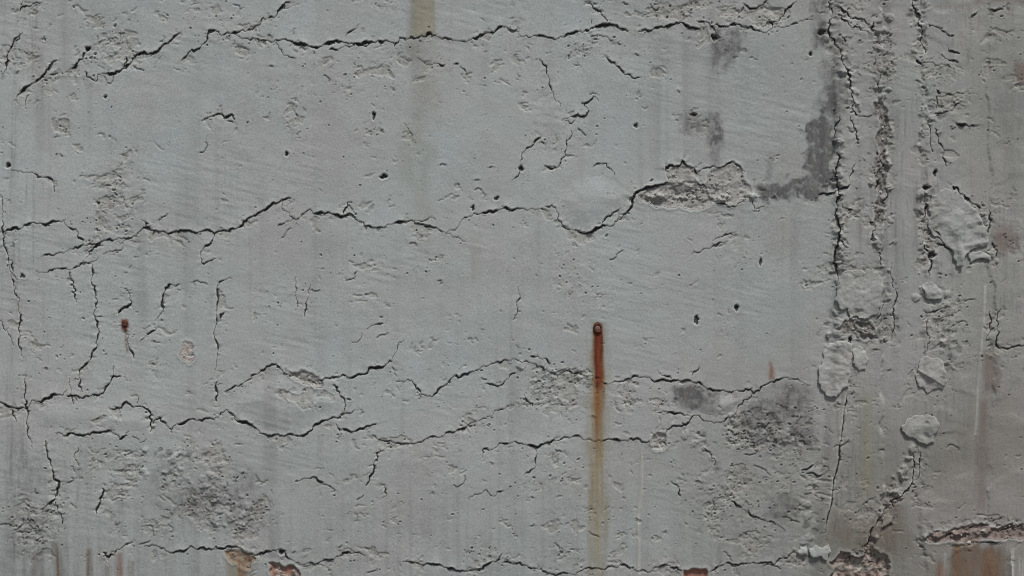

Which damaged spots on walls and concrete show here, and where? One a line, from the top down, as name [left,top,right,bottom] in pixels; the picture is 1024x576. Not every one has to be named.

crack [5,1,898,331]
spalling [638,163,752,210]
water stain [759,71,837,201]
crack [0,160,804,523]
rust [592,331,604,501]
crack [803,398,847,524]
crack [103,543,358,565]
spalling [225,550,256,570]
spalling [269,549,301,576]
crack [402,554,635,576]
spalling [797,513,893,576]
spalling [924,523,1024,546]